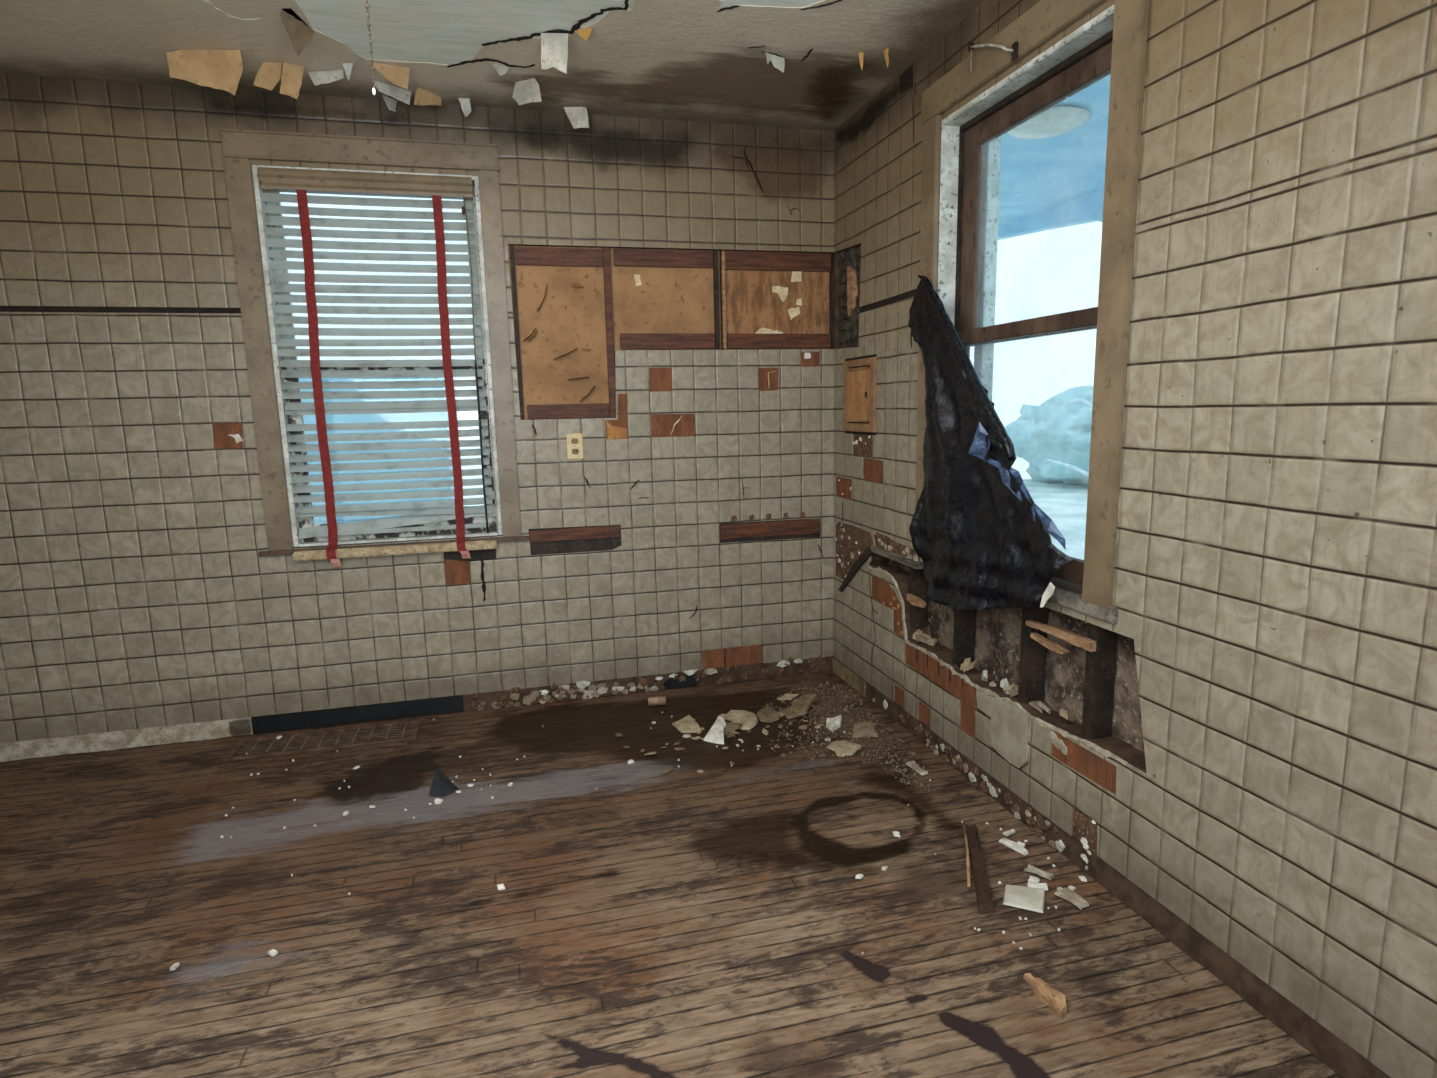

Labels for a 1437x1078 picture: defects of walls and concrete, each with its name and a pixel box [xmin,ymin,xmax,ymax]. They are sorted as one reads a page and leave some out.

crack [716,4,740,12]
crack [801,0,842,10]
crack [447,0,629,68]
peeling [167,0,634,112]
crack [748,46,813,61]
peeling [564,107,589,129]
peeling [213,423,243,449]
peeling [651,414,695,437]
peeling [529,525,621,555]
peeling [444,549,496,585]
peeling [719,512,1128,795]
spalling [463,645,1391,1078]